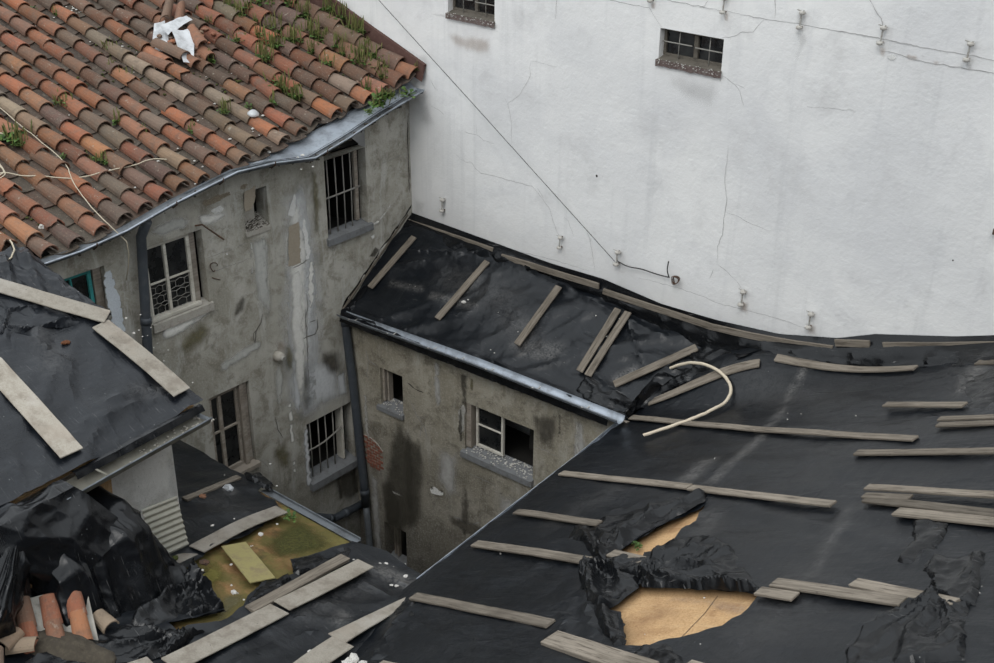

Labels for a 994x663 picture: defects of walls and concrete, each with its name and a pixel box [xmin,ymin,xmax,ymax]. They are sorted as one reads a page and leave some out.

crack [611,0,994,73]
crack [640,154,801,327]
peeling [104,270,126,331]
peeling [288,194,314,406]
damp [373,429,421,549]
damp [441,454,454,491]
damp [452,493,481,535]